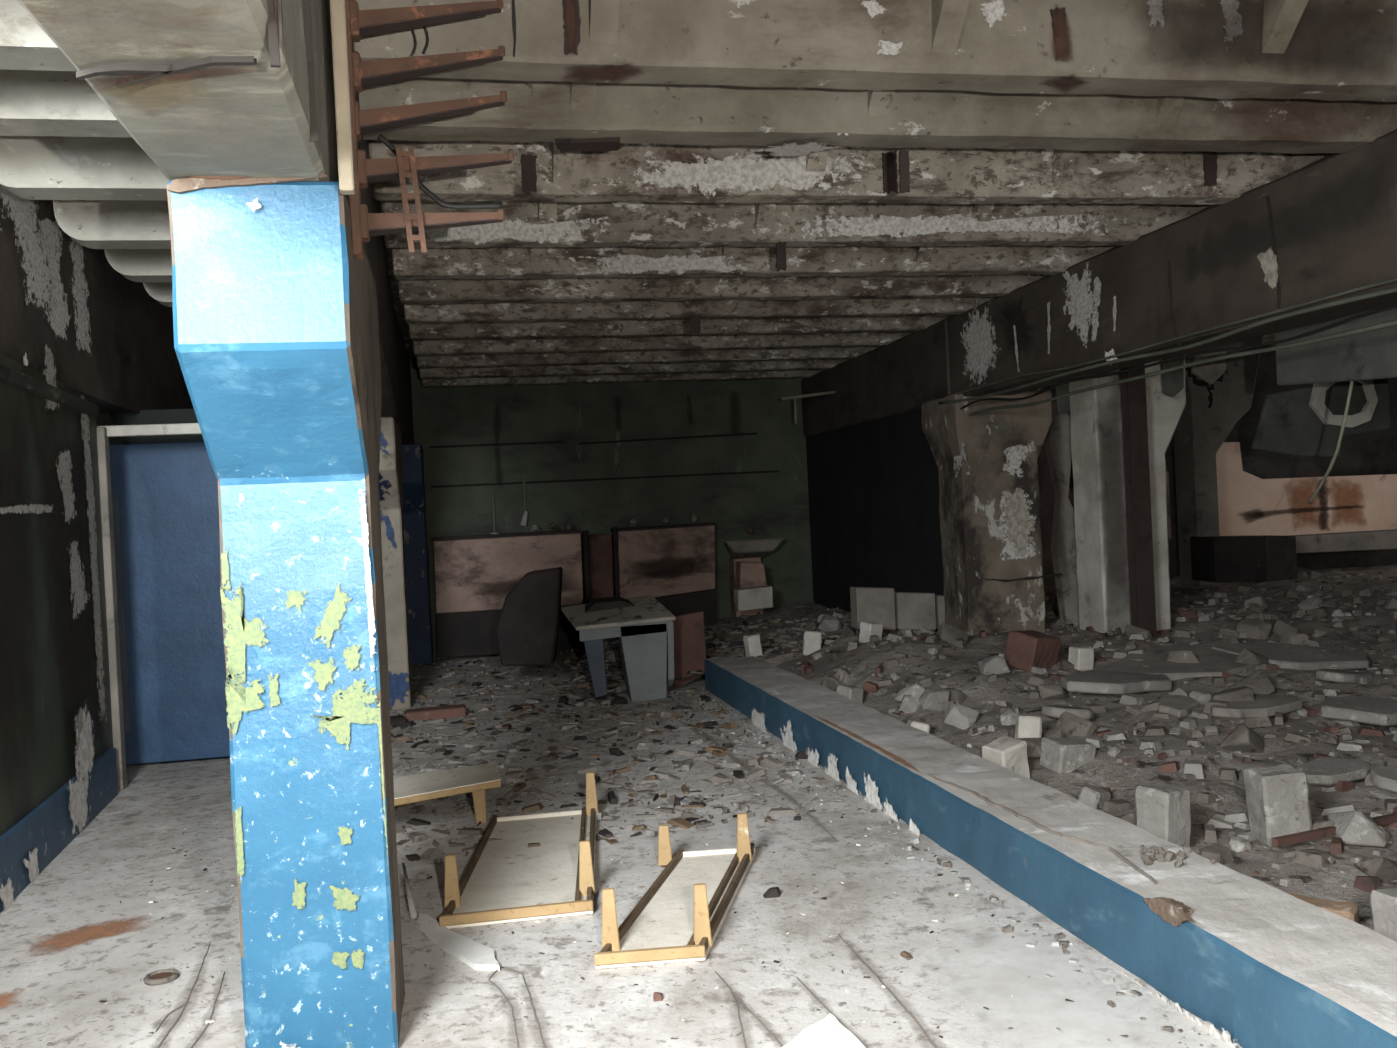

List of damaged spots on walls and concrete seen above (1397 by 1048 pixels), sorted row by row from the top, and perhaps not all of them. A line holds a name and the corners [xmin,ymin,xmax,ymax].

corrosion [562,0,641,84]
corrosion [1043,7,1085,92]
peeling [616,132,898,198]
peeling [401,210,1110,276]
peeling [0,185,92,411]
peeling [960,299,1027,387]
peeling [1063,262,1100,348]
peeling [992,445,1041,561]
peeling [55,395,107,845]
peeling [220,545,281,737]
peeling [308,472,409,865]
peeling [0,849,39,912]